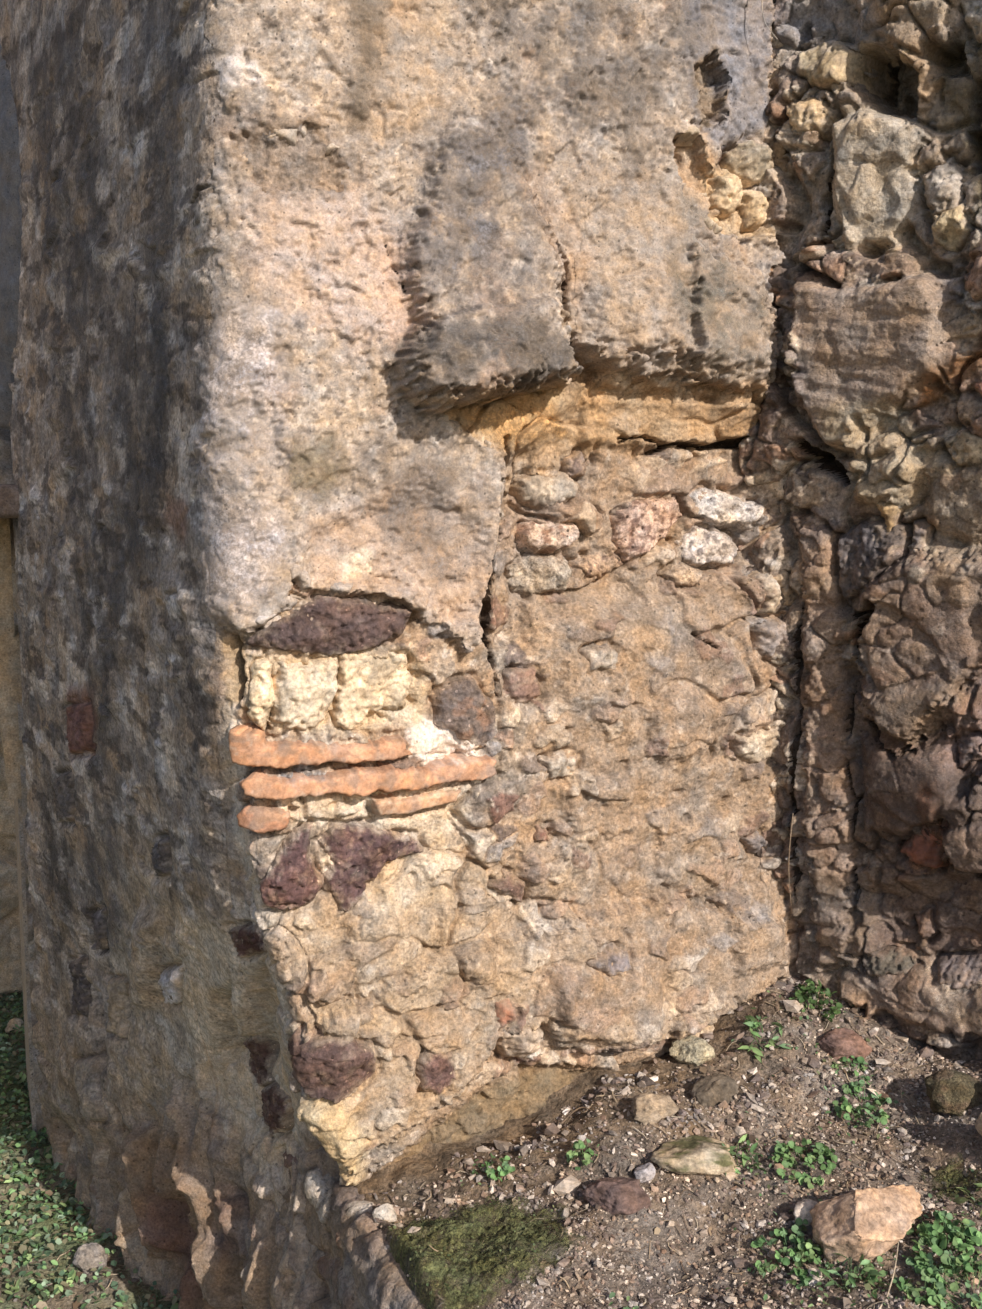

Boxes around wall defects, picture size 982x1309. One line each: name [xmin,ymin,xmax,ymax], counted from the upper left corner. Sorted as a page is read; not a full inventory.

crack [619,436,746,455]
crack [798,439,851,484]
crack [479,560,499,697]
crack [690,632,716,649]
crack [787,607,805,896]